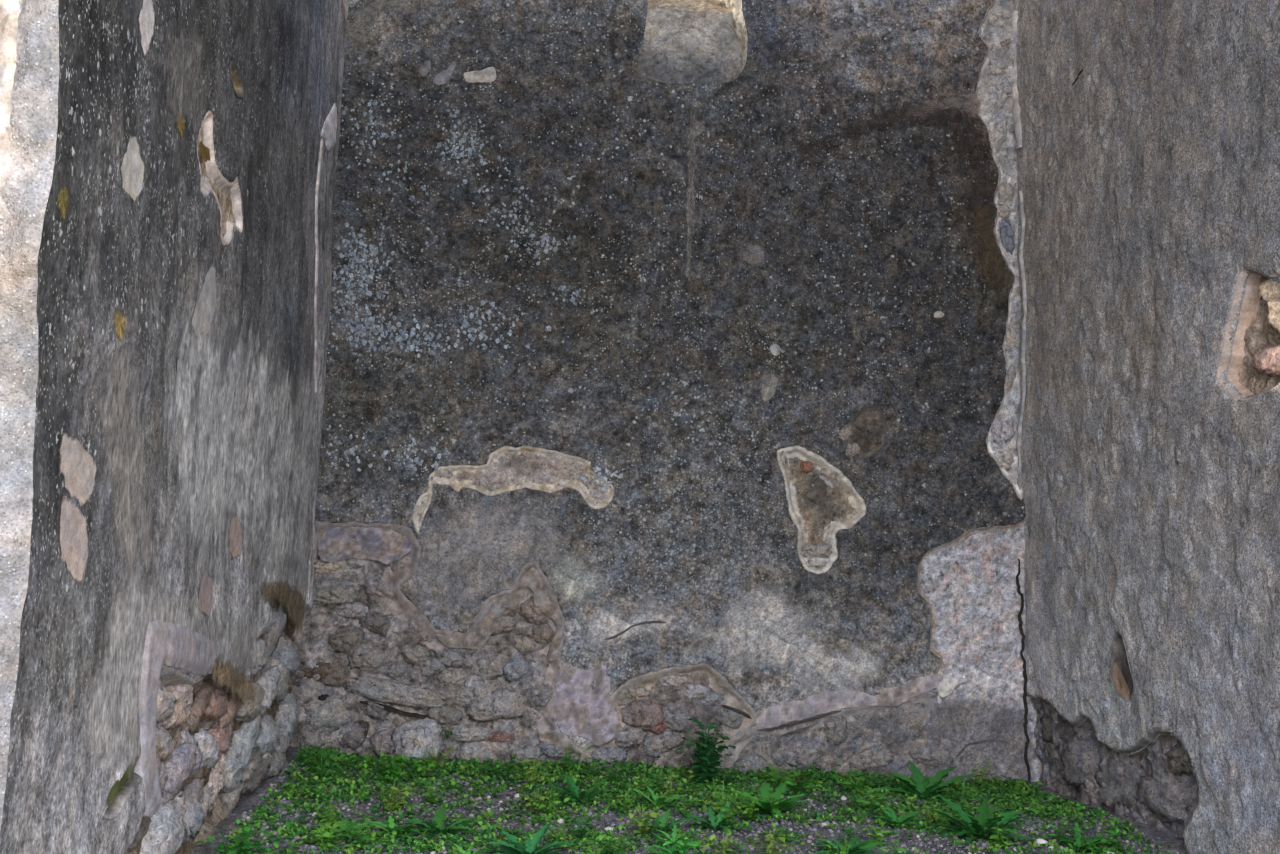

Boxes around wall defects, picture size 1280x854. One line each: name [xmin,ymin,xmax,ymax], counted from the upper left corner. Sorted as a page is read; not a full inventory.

spalling [197,110,243,246]
peeling [321,103,337,151]
spalling [419,60,497,85]
flaking render [975,0,1023,500]
spalling [769,344,781,356]
flaking render [1216,268,1280,401]
spalling [776,405,887,574]
flaking render [125,445,1198,854]
crack [955,559,1031,783]